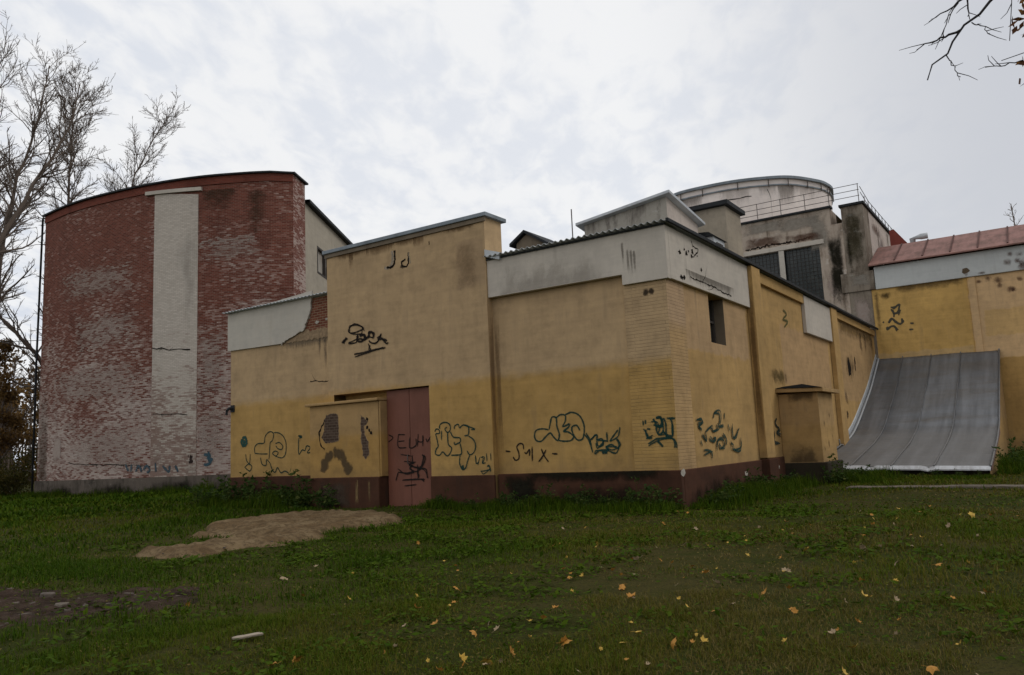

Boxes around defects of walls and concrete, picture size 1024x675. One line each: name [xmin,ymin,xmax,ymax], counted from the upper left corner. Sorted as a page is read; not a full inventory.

crack [690,241,731,296]
damp [829,217,867,294]
flaking render [281,291,328,346]